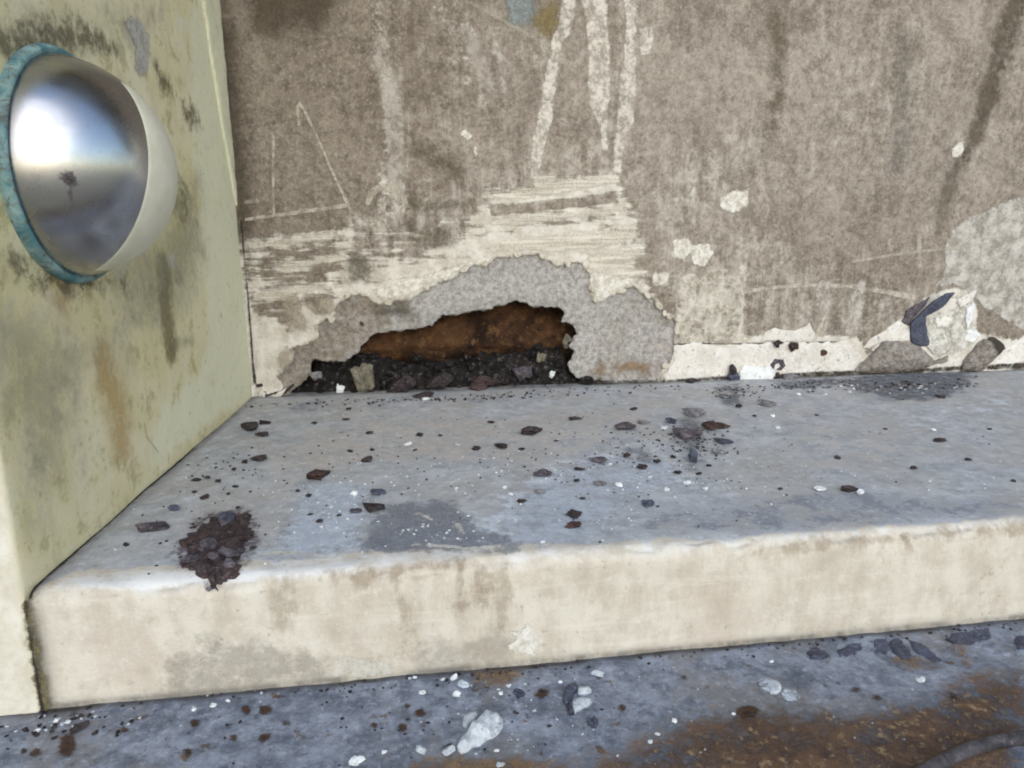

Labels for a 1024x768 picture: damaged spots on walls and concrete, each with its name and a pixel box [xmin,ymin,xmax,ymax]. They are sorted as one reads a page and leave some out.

peeling [485,172,620,203]
flaking render [249,206,980,397]
peeling [982,335,1024,371]
damp [412,523,501,550]
rust [645,644,1024,768]